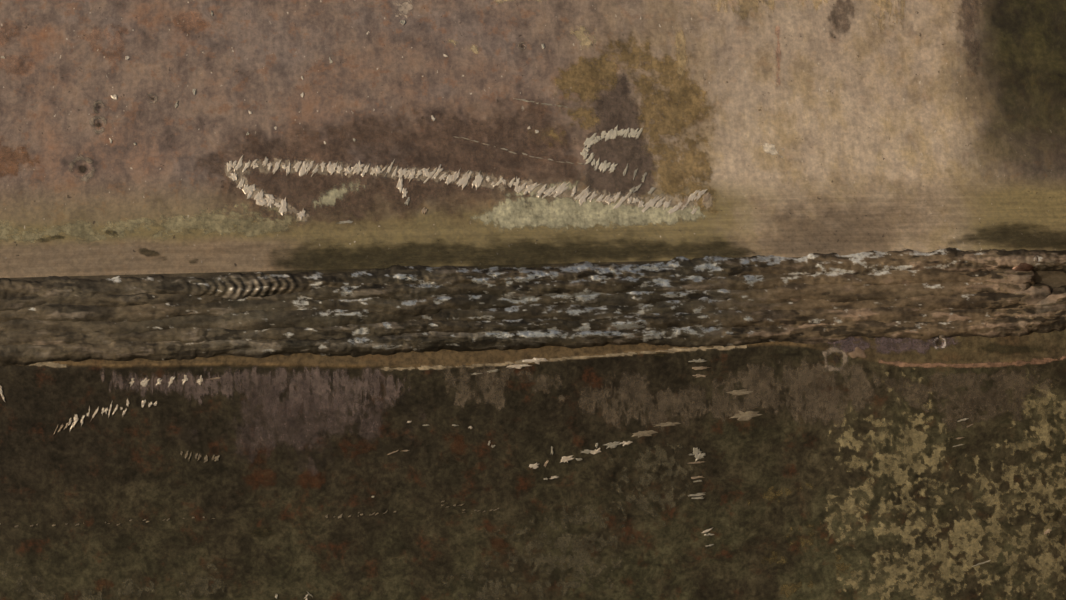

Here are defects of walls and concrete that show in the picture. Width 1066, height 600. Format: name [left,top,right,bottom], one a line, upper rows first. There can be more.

leakage [203,74,656,227]
leakage [786,365,1066,600]